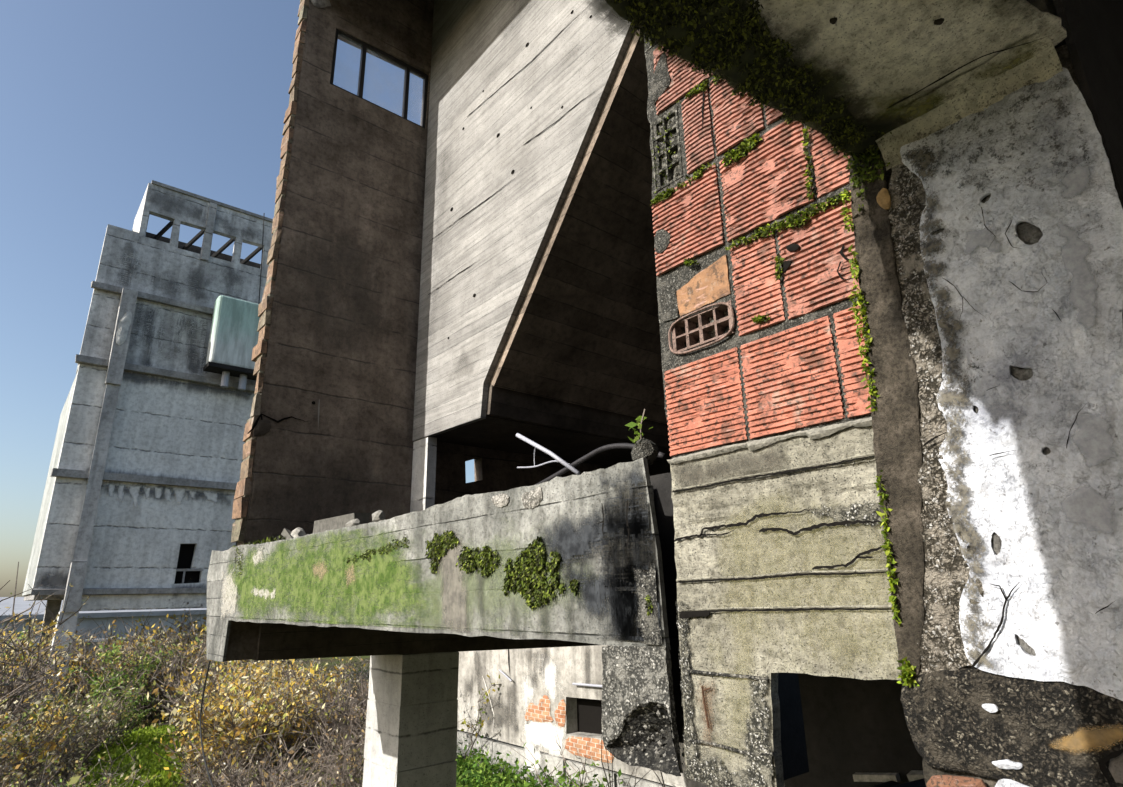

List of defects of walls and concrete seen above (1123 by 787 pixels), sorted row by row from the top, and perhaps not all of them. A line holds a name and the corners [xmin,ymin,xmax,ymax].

spalling [254,419,271,437]
crack [248,413,306,434]
leakage [107,471,226,507]
leakage [543,470,656,641]
crack [674,509,882,570]
crack [971,583,1019,669]
spalling [525,601,773,787]
flaking render [900,668,1123,787]